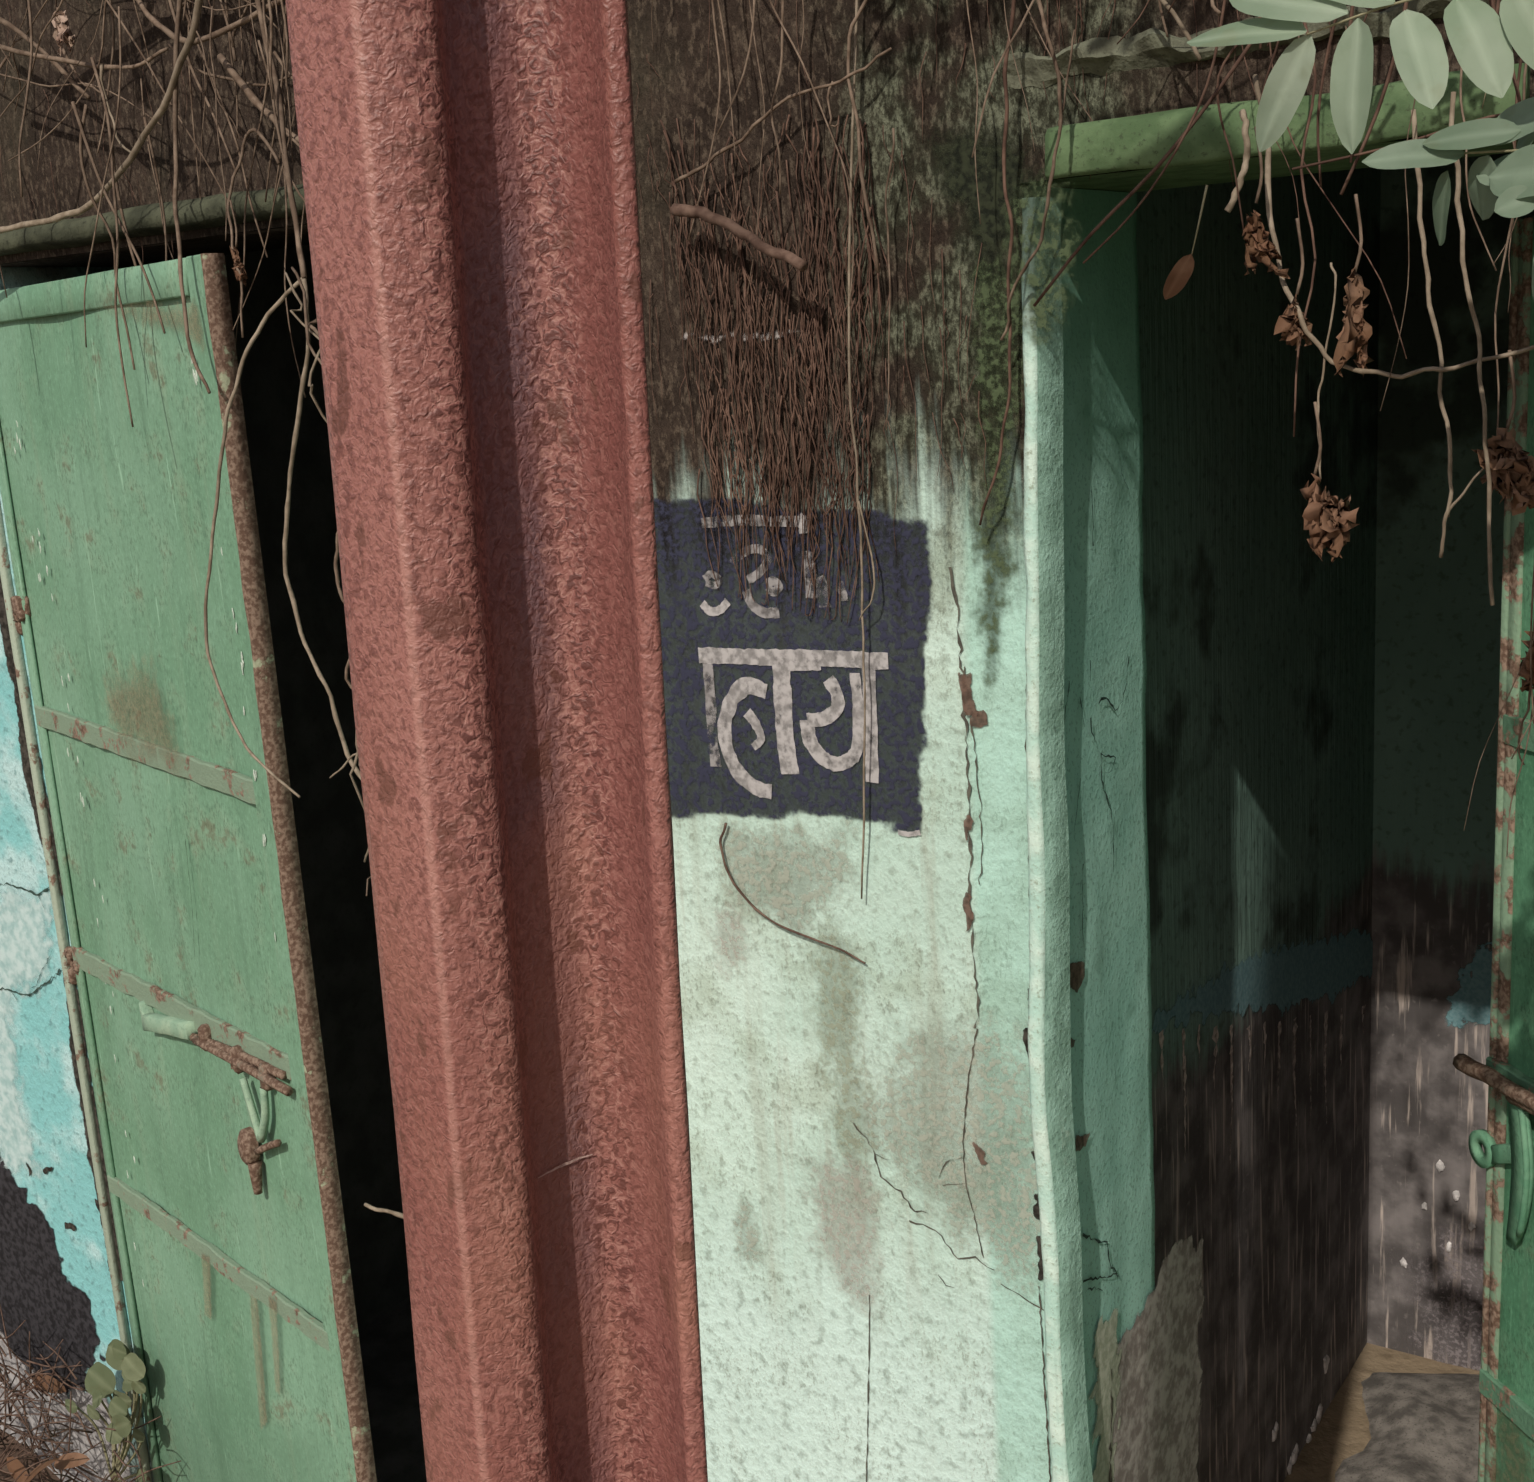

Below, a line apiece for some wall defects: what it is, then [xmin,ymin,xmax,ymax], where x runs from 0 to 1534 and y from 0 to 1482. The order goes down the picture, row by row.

crack [948,567,965,674]
spalling [958,672,988,728]
crack [0,949,60,1002]
crack [2,877,61,906]
peeling [0,576,136,1482]
leakage [820,937,1040,1293]
crack [853,710,1051,1482]
spalling [962,892,974,931]
spalling [963,814,974,843]
crack [1064,656,1130,933]
peeling [1089,1235,1205,1482]
leakage [1409,1225,1484,1371]